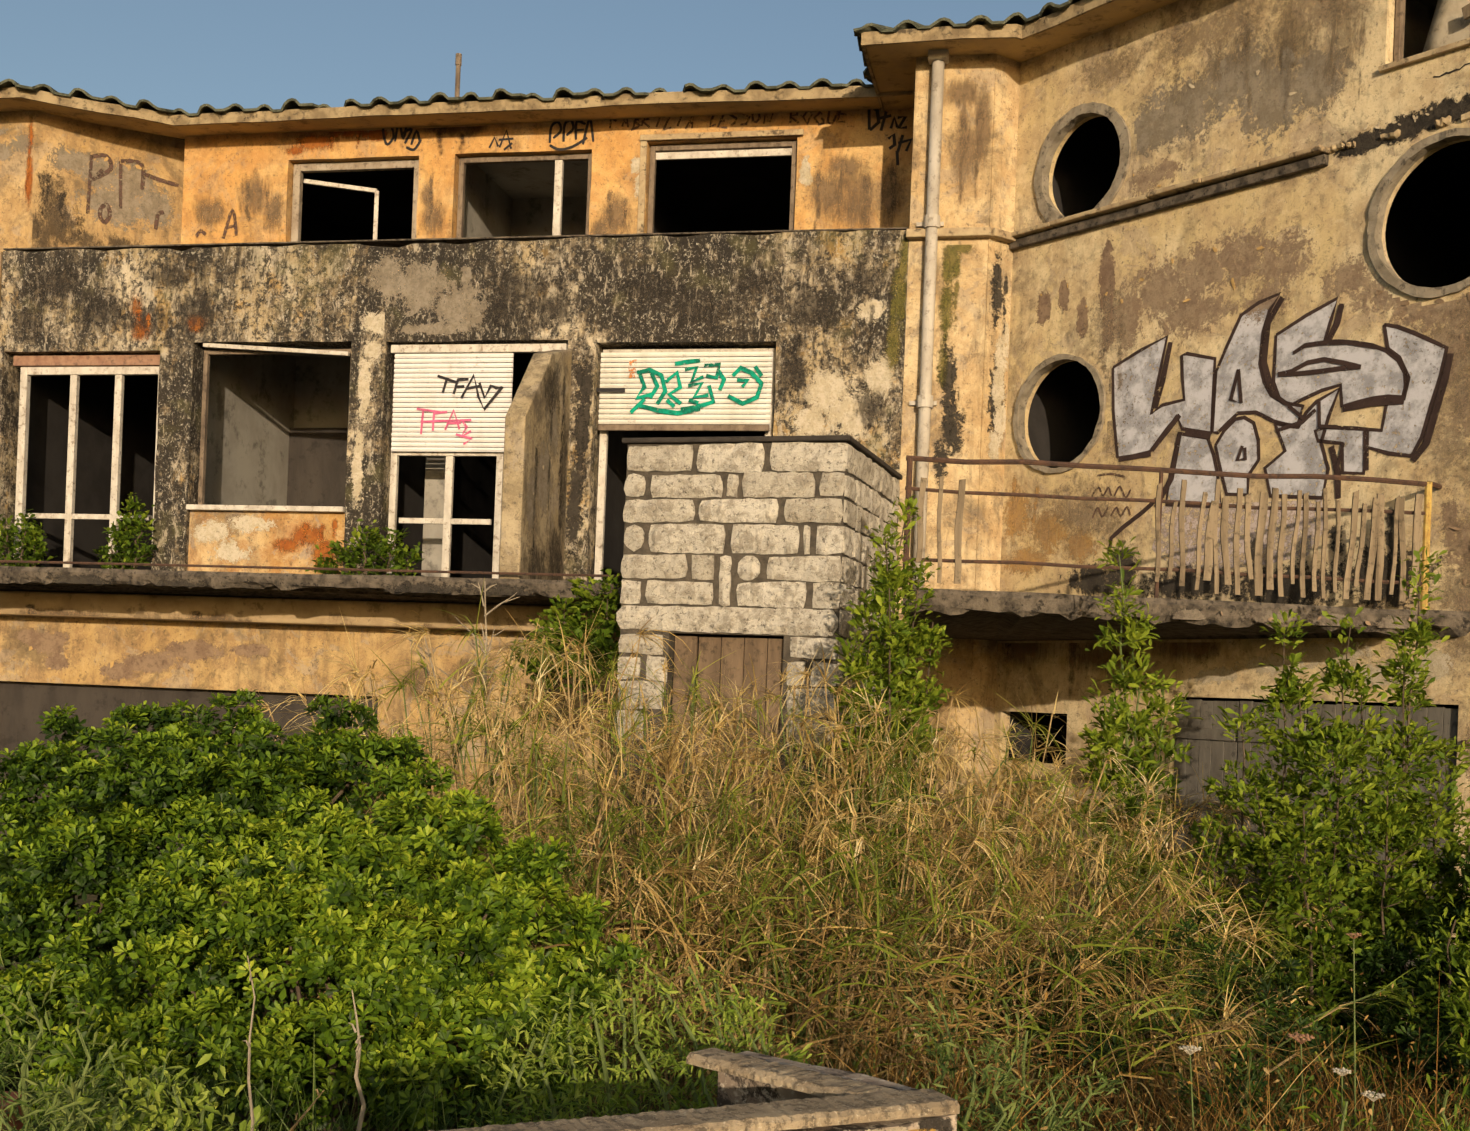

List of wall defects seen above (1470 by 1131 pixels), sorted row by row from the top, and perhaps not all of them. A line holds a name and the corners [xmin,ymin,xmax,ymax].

crack [1433,63,1470,78]
spalling [1326,92,1470,159]
leakage [10,171,223,340]
leakage [368,252,578,341]
leakage [932,256,967,485]
leakage [986,249,1008,433]
peeling [1035,218,1470,445]
leakage [1038,288,1470,611]
peeling [190,513,278,565]
leakage [1069,642,1217,691]
peeling [1172,608,1459,690]